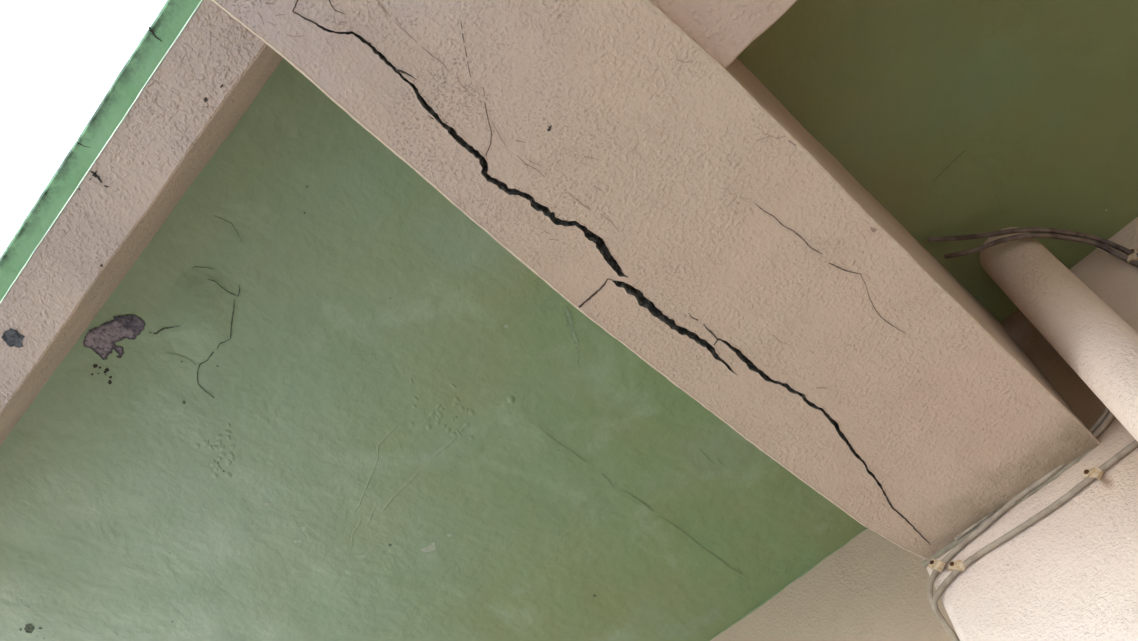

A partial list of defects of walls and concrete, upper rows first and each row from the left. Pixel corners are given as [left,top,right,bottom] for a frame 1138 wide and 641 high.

peeling [1,327,25,348]
spalling [83,314,146,384]
crack [148,266,240,398]
crack [257,0,931,545]
crack [539,426,749,578]